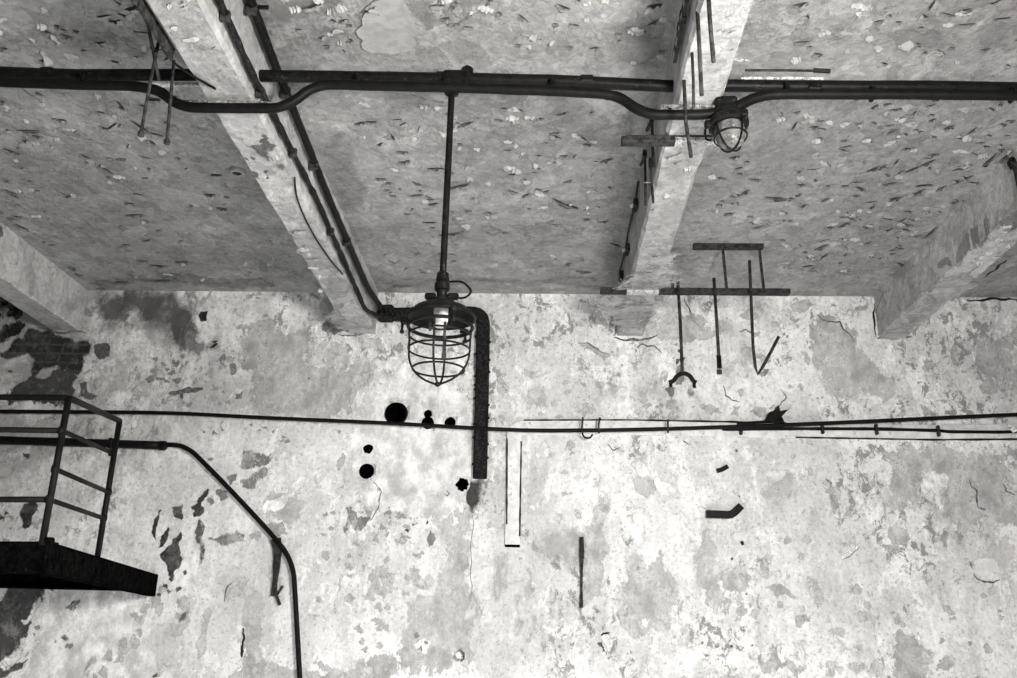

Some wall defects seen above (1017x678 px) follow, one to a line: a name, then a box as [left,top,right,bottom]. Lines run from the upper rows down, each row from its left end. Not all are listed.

peeling [515,33,574,51]
peeling [552,0,677,66]
peeling [0,100,111,237]
peeling [79,94,207,184]
peeling [94,252,276,291]
flaking render [0,300,110,420]
damp [98,290,209,354]
peeling [86,451,306,678]